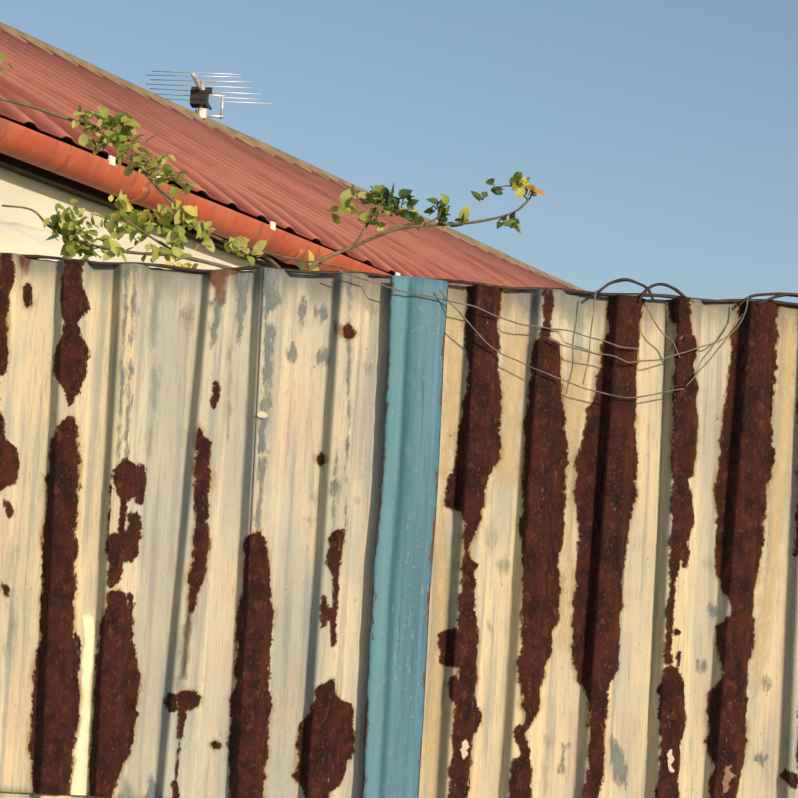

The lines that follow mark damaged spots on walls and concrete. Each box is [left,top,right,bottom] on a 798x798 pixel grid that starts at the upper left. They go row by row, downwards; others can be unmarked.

rust [0,412,20,520]
rust [0,252,33,376]
rust [28,259,91,795]
rust [88,457,147,798]
rust [183,427,214,675]
rust [210,531,276,798]
rust [292,678,356,798]
rust [320,528,346,647]
rust [437,285,503,798]
rust [509,289,646,798]
rust [654,298,700,798]
rust [704,300,781,798]